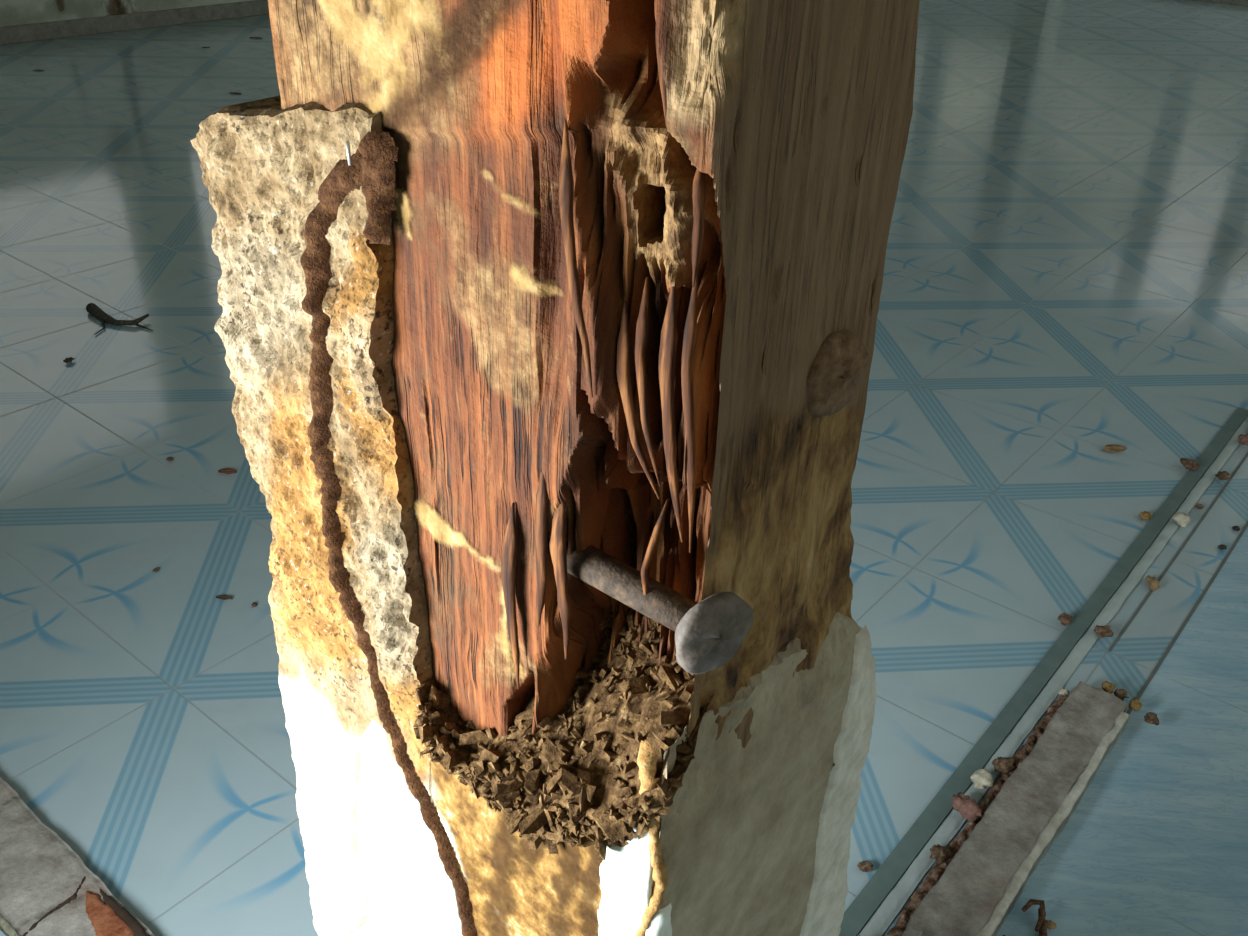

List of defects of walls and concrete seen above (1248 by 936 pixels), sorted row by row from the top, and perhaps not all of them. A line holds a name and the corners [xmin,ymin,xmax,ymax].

peeling [290,706,463,936]
peeling [597,827,672,936]
peeling [800,625,877,936]